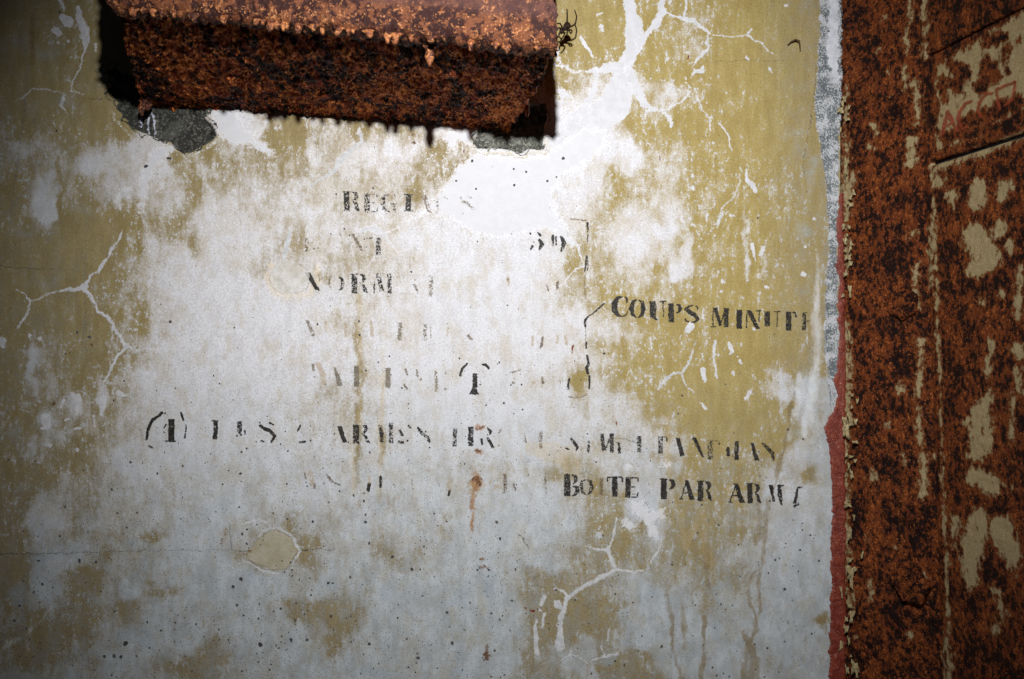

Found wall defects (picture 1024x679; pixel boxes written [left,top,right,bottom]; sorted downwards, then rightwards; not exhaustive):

corrosion [128,7,200,23]
corrosion [251,19,438,67]
corrosion [491,41,512,54]
crack [579,12,604,58]
spalling [100,62,278,217]
crack [665,0,784,228]
crack [0,232,159,383]
corrosion [469,471,483,530]
spalling [103,587,230,678]
spalling [233,551,335,678]
crack [544,517,663,664]
leakage [669,608,687,679]